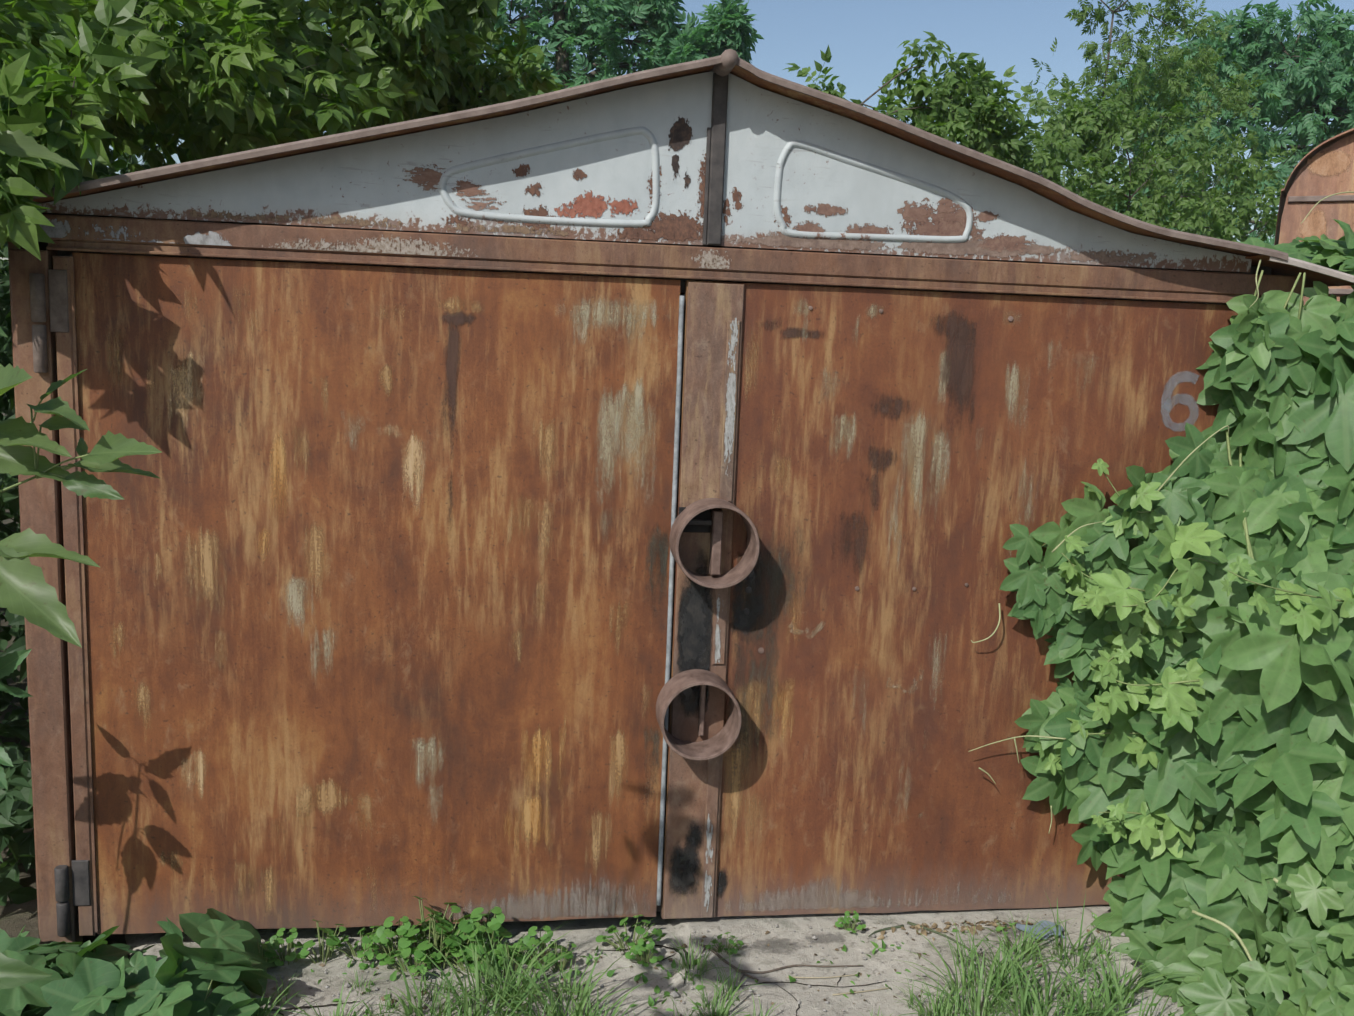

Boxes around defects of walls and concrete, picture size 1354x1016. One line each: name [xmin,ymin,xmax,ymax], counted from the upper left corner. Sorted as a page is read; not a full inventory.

peeling [39,218,232,246]
peeling [262,234,478,257]
peeling [403,150,732,269]
peeling [723,187,743,227]
peeling [774,197,1035,253]
corrosion [443,299,479,429]
corrosion [936,312,976,421]
corrosion [404,436,422,502]
corrosion [188,533,218,596]
corrosion [188,752,204,790]
corrosion [296,781,346,812]
corrosion [505,730,563,844]